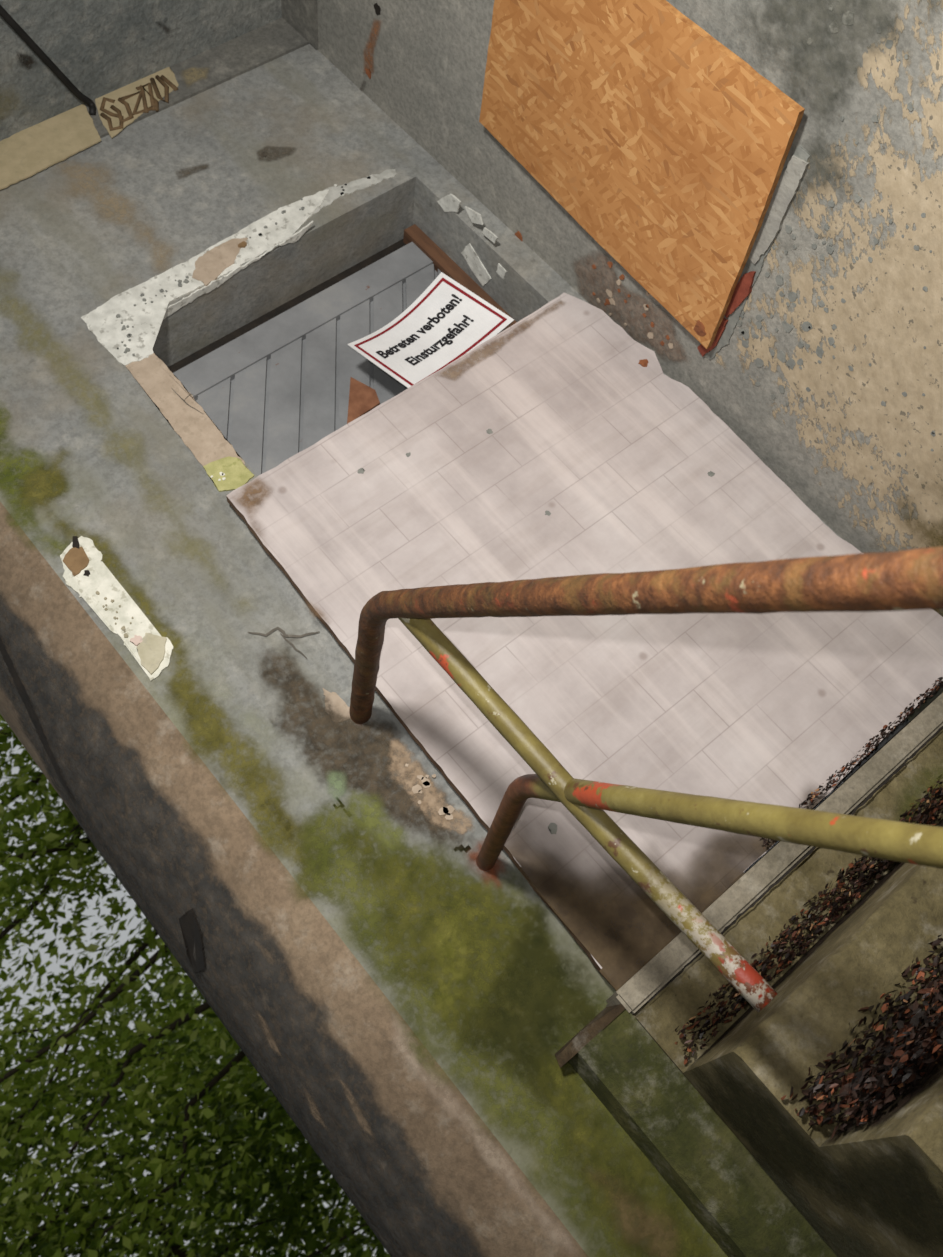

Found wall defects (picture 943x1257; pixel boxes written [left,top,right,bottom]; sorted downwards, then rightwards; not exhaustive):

corrosion [361,3,381,89]
leakage [759,0,895,114]
leakage [805,138,840,186]
peeling [575,0,943,552]
leakage [263,656,458,847]
spalling [389,740,472,834]
leakage [661,835,777,913]
leakage [485,841,682,1093]